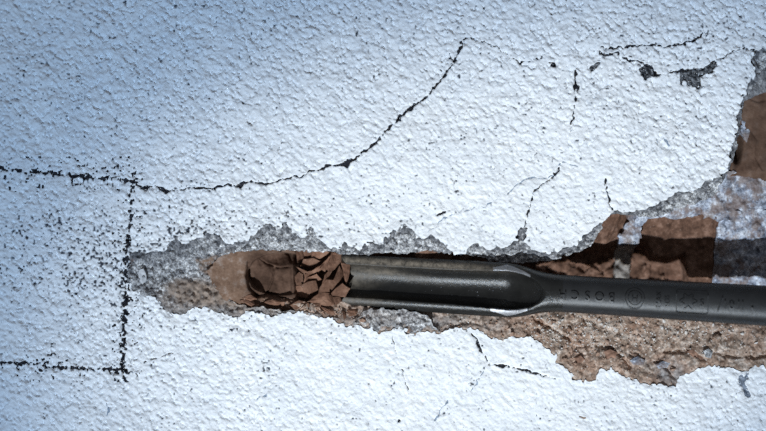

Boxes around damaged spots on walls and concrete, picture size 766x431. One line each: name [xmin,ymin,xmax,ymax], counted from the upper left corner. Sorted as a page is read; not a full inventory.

crack [0,38,578,390]
spalling [127,48,766,398]
crack [570,33,755,132]